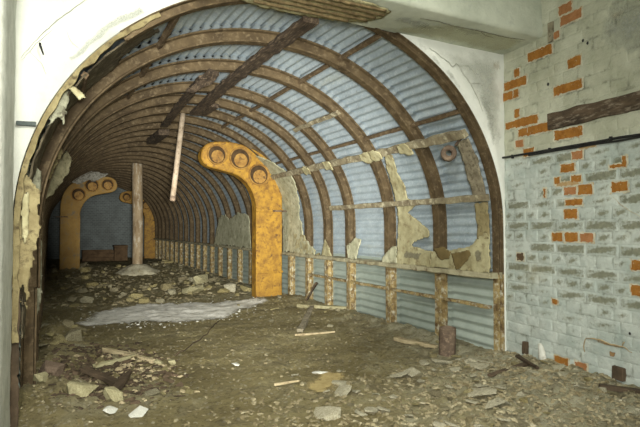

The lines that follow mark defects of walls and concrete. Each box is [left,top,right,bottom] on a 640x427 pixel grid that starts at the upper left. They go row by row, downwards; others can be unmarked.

peeling [527,0,583,63]
peeling [567,53,582,70]
peeling [69,85,86,100]
peeling [503,67,528,103]
peeling [547,77,584,98]
peeling [72,171,107,184]
peeling [609,180,630,195]
peeling [21,192,29,243]
peeling [551,231,596,244]
peeling [433,247,471,270]
peeling [629,258,640,272]
peeling [629,283,640,298]